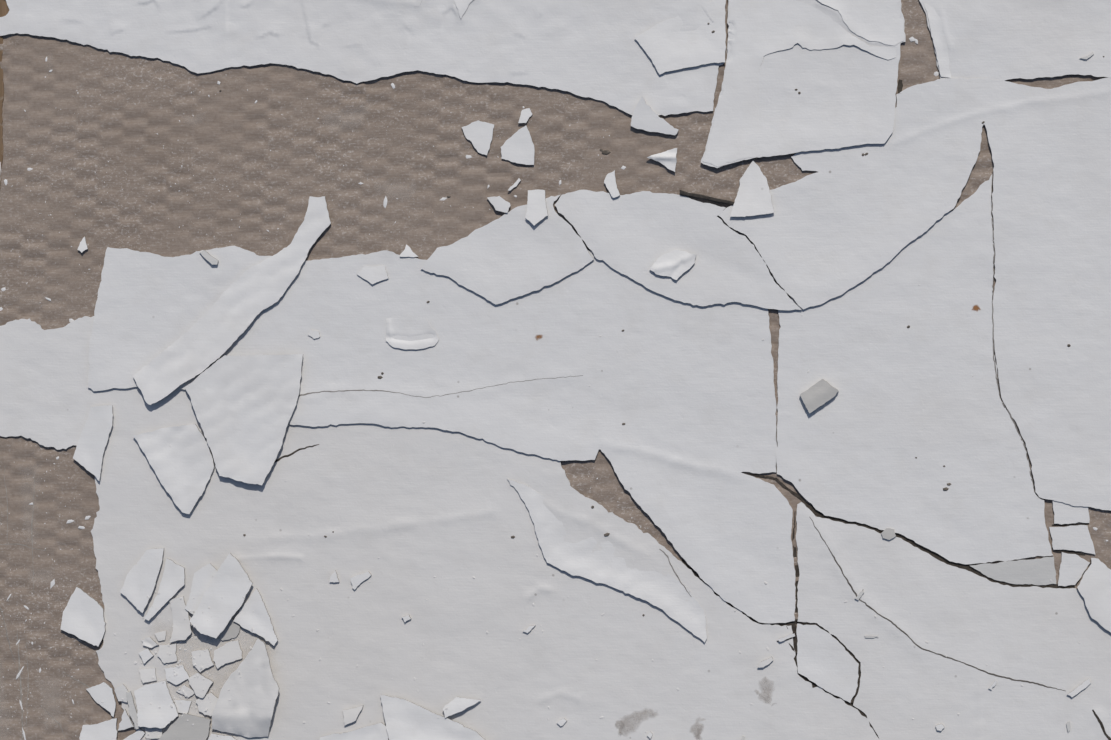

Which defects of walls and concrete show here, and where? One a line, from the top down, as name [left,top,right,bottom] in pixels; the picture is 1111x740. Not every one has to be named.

peeling [0,0,906,642]
peeling [718,0,1111,632]
crack [991,172,1039,499]
peeling [0,405,163,740]
crack [659,429,1091,738]
crack [1092,710,1111,740]